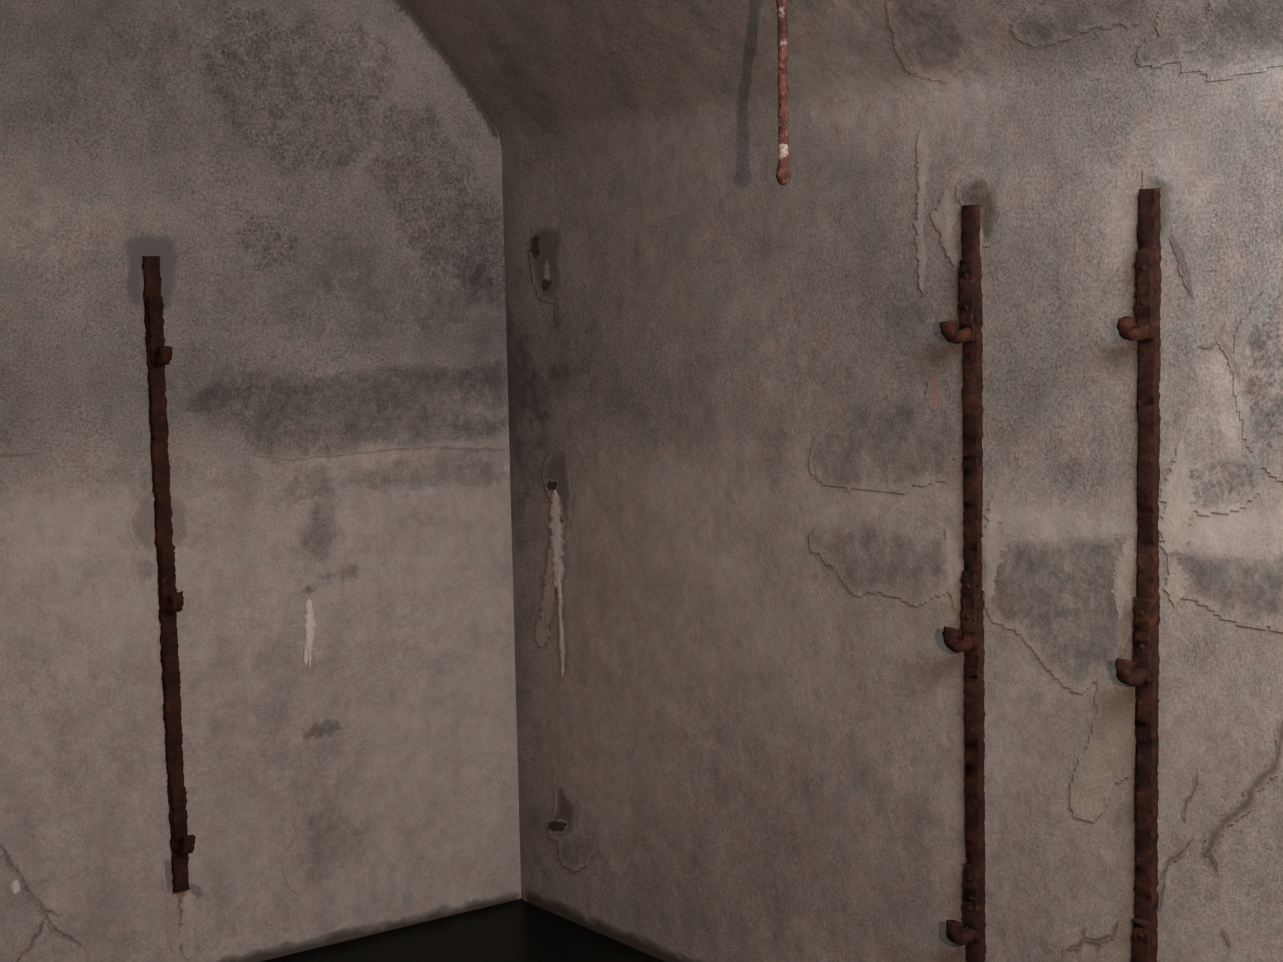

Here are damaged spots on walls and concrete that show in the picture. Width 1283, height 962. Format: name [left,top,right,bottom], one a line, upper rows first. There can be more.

damp [303,598,319,670]
damp [534,490,566,676]
crack [1158,718,1283,911]
crack [0,839,83,962]
crack [1067,919,1119,950]